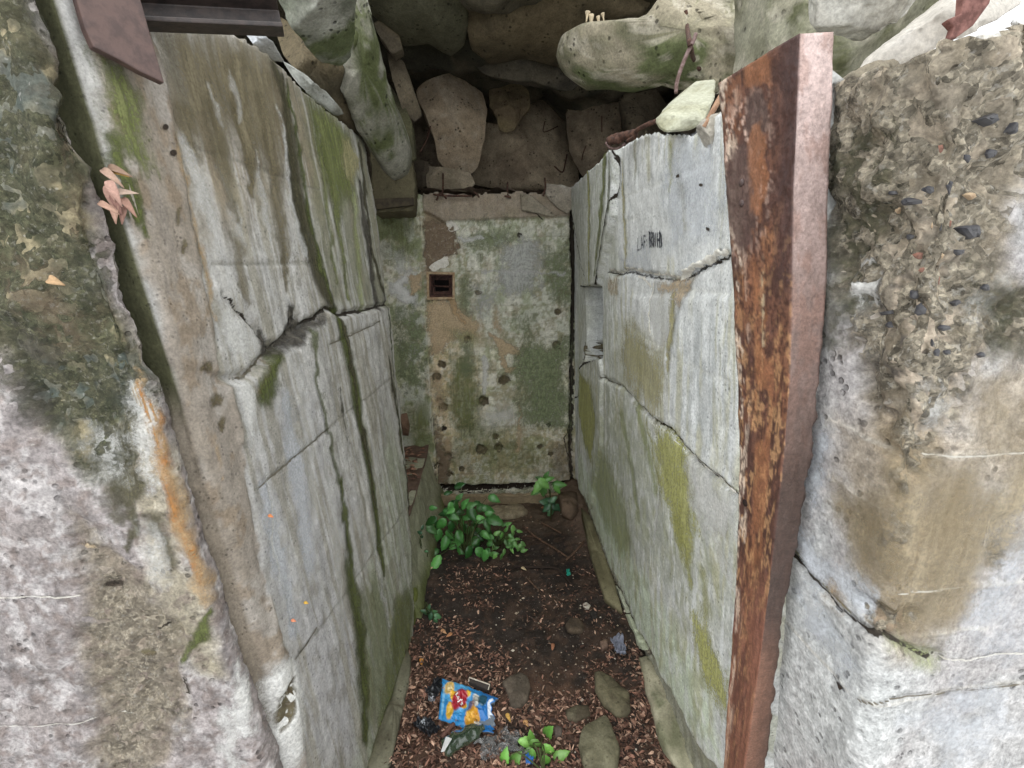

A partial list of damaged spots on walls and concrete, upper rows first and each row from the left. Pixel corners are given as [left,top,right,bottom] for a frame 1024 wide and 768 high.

crack [224,297,281,380]
damp [159,33,452,744]
crack [297,304,386,345]
crack [440,150,739,511]
rust [134,377,215,603]
crack [794,551,933,658]
damp [836,469,1024,661]